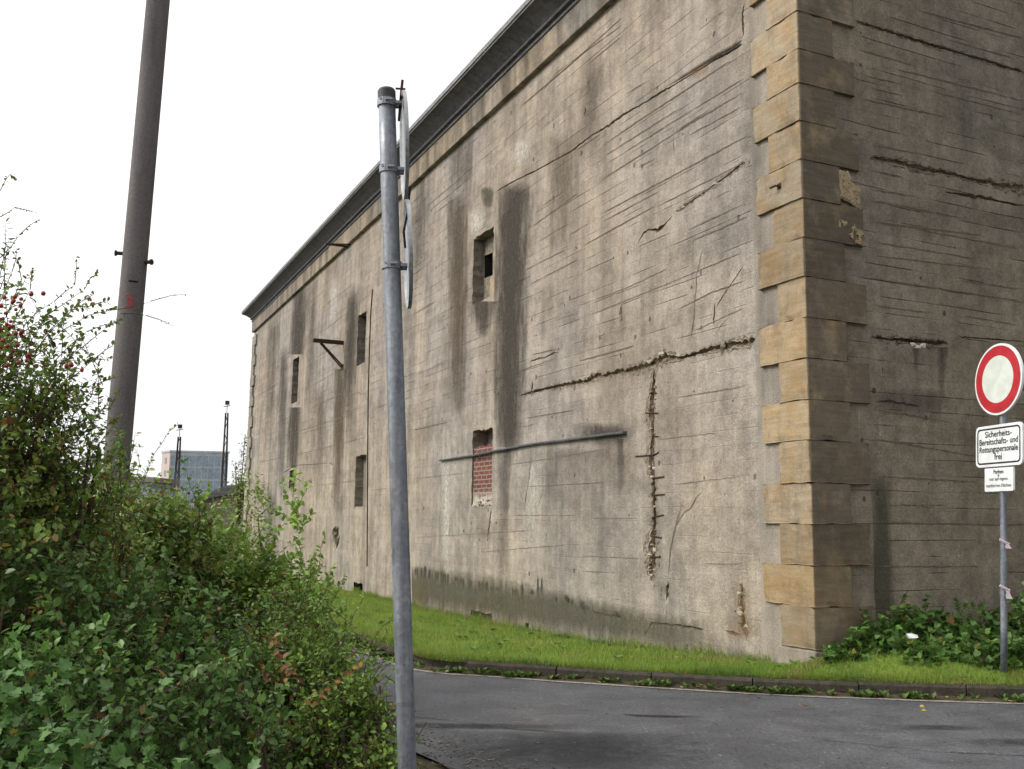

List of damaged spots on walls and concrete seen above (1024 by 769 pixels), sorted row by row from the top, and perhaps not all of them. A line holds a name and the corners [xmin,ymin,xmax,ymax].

spalling [839,170,861,210]
crack [638,216,672,243]
spalling [837,219,864,245]
leakage [449,189,529,458]
crack [520,247,755,398]
crack [872,334,1024,349]
spalling [646,467,669,600]
leakage [412,567,686,647]
spalling [725,583,748,640]